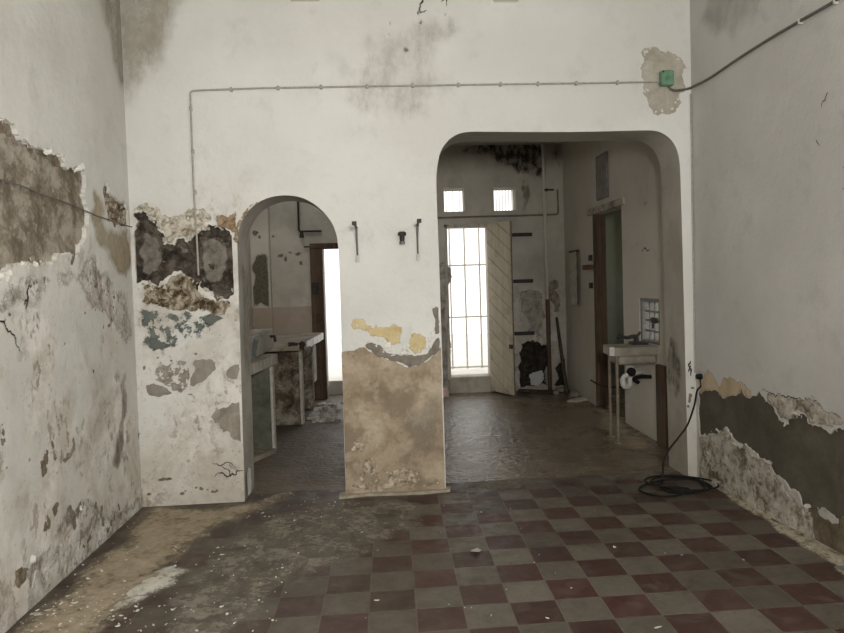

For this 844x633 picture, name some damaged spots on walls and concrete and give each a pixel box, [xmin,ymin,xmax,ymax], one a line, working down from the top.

leakage [105,0,168,83]
flaking render [639,47,689,116]
leakage [464,145,542,176]
flaking render [0,119,131,341]
flaking render [103,186,259,397]
flaking render [341,262,452,494]
flaking render [518,340,565,388]
peeling [41,438,75,477]
flaking render [211,402,241,442]
crack [213,462,243,477]
flaking render [687,370,844,538]
peeling [0,493,151,633]